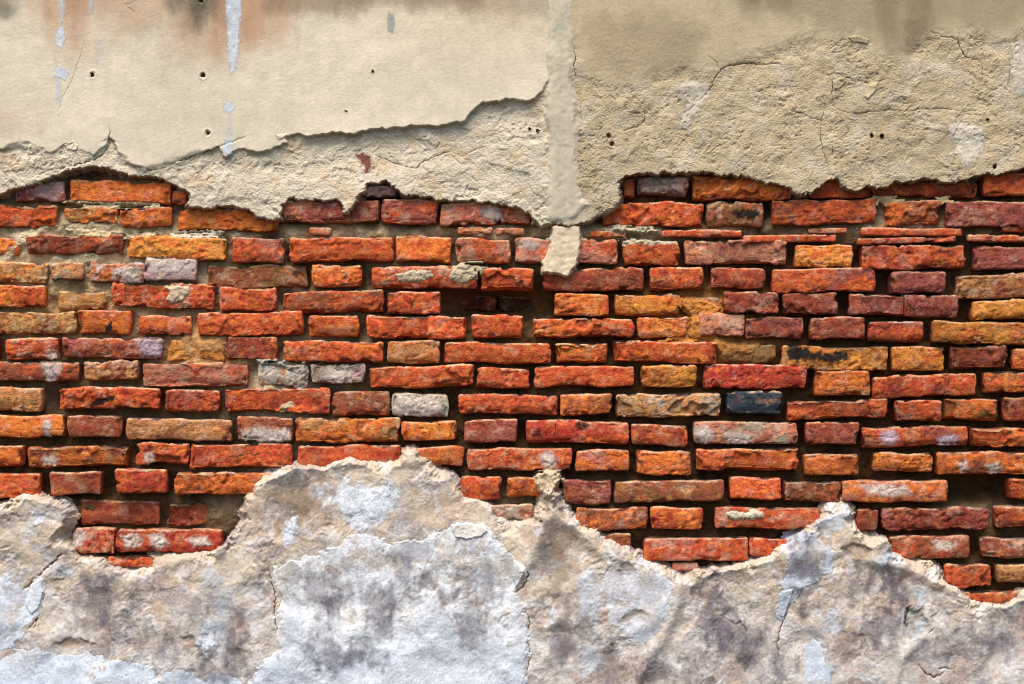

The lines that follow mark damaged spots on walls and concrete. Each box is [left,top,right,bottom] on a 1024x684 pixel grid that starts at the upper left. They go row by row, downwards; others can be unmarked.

leakage [226,0,241,73]
crack [709,56,779,91]
crack [931,31,1011,90]
flaking render [0,30,1024,230]
crack [793,73,987,172]
leakage [122,533,169,548]
leakage [189,536,210,546]
peeling [0,521,532,684]
efflorescence [309,475,401,532]
leakage [279,589,529,684]
peeling [602,554,674,644]
peeling [775,530,834,621]